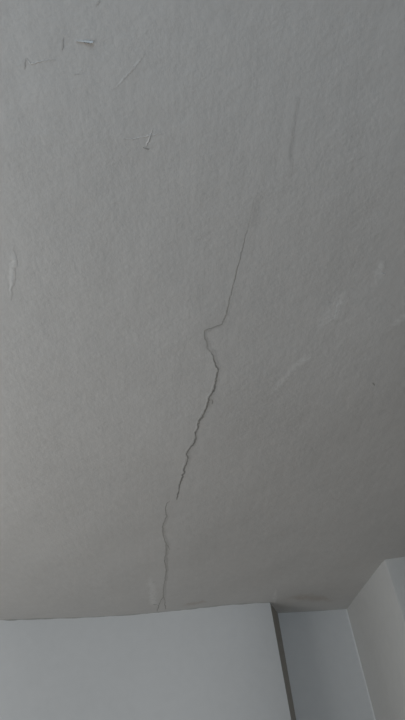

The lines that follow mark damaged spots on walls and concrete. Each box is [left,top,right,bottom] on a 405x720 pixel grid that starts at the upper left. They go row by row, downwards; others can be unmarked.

crack [80,187,274,618]